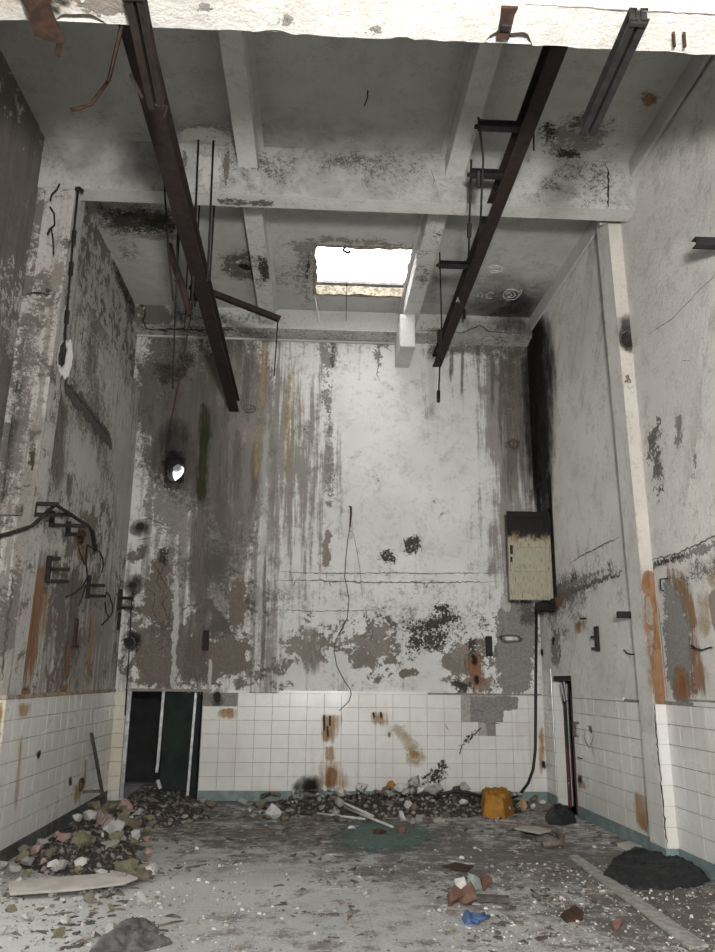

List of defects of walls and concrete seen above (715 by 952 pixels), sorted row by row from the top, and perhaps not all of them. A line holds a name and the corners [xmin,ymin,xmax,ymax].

damp [448,344,533,495]
spalling [278,629,325,671]
spalling [344,622,519,736]
rust [642,570,668,704]
rust [321,716,344,788]